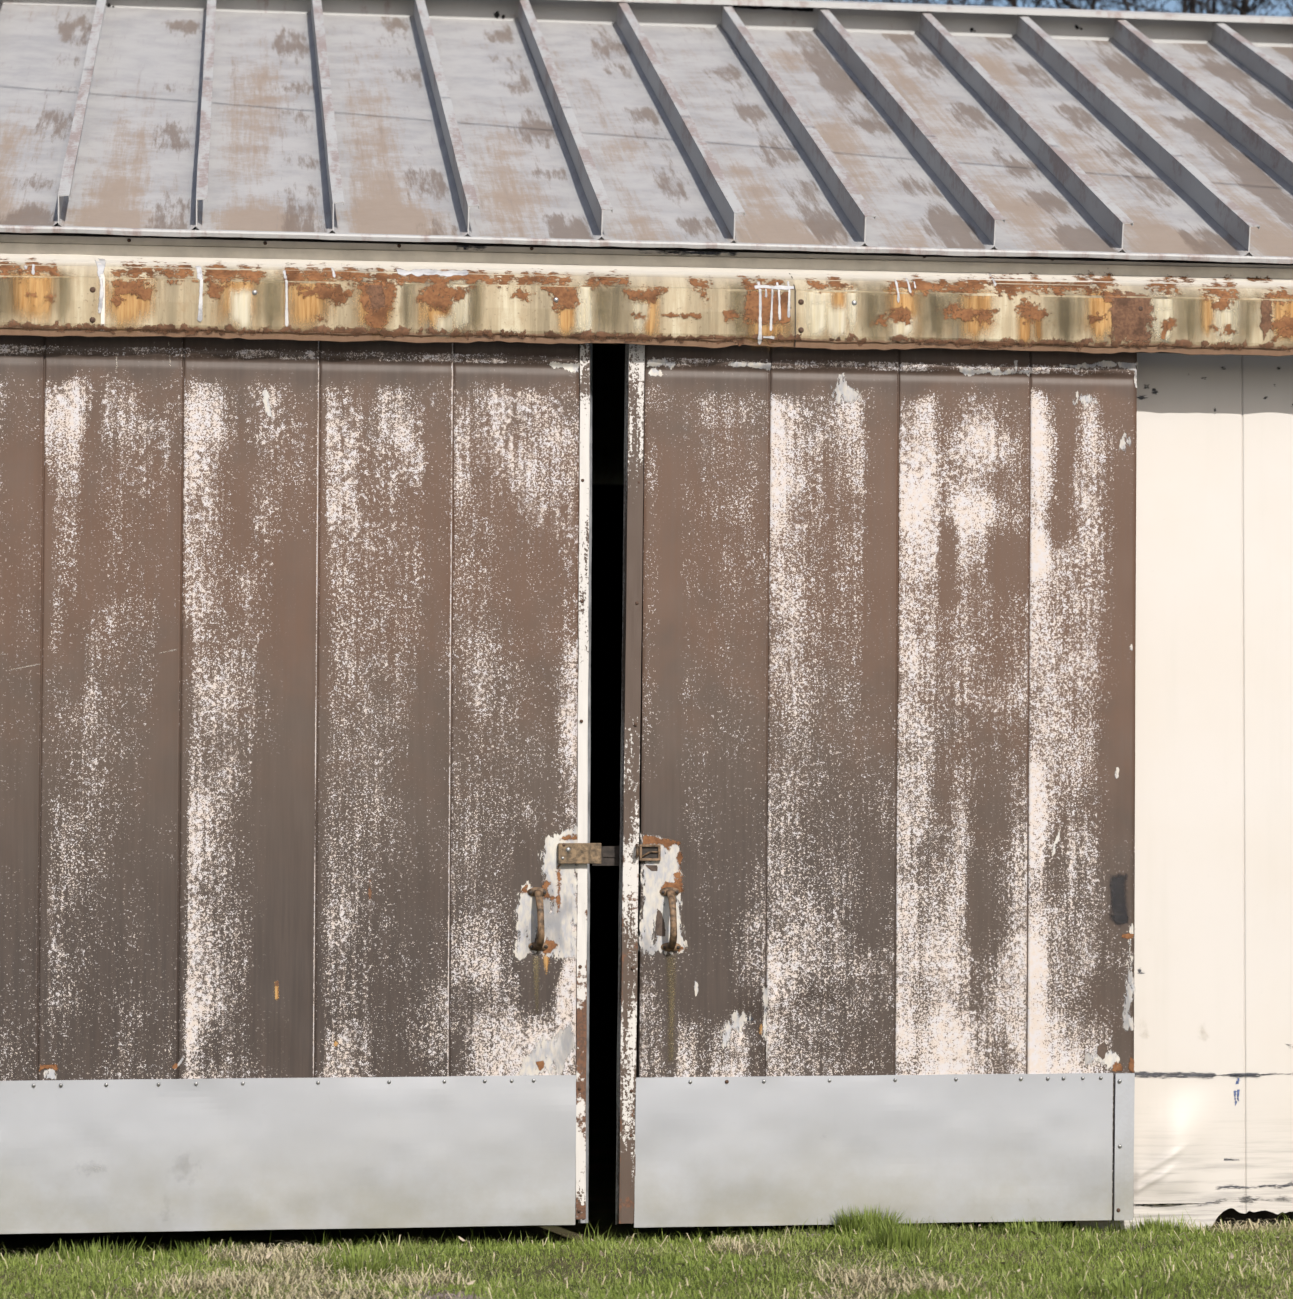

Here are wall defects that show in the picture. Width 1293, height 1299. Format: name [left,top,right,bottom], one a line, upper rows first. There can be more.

corrosion [0,258,1293,351]
peeling [549,361,580,373]
peeling [647,357,675,377]
peeling [728,361,771,371]
peeling [829,373,862,404]
peeling [959,360,1030,376]
peeling [1060,360,1158,400]
peeling [513,825,578,972]
peeling [639,834,688,956]
peeling [1122,924,1144,1031]
peeling [719,987,769,1056]
peeling [1085,1042,1135,1073]